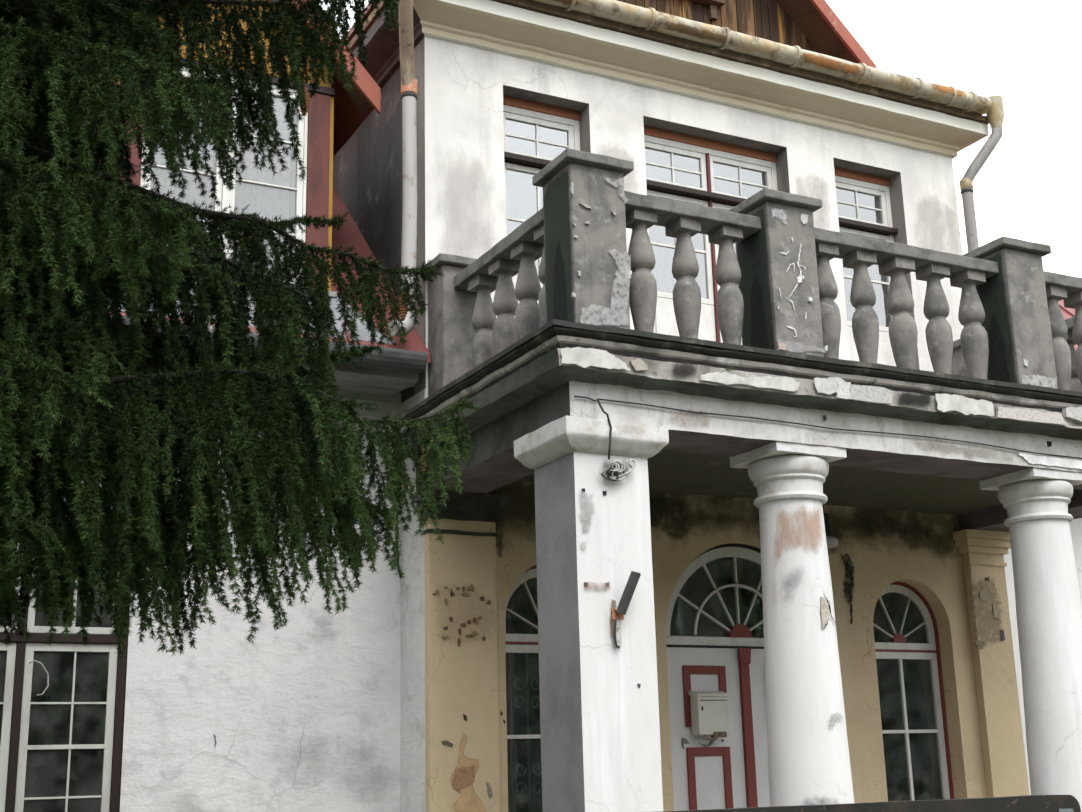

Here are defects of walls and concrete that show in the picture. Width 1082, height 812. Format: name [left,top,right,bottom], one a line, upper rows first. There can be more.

corrosion [804,52,860,74]
corrosion [932,82,964,96]
peeling [580,249,631,326]
crack [776,238,813,337]
peeling [700,372,800,391]
peeling [814,377,894,404]
spalling [1021,359,1057,388]
peeling [935,394,1082,430]
peeling [1019,441,1082,470]
water stain [488,481,536,556]
water stain [649,491,760,539]
water stain [828,507,933,624]